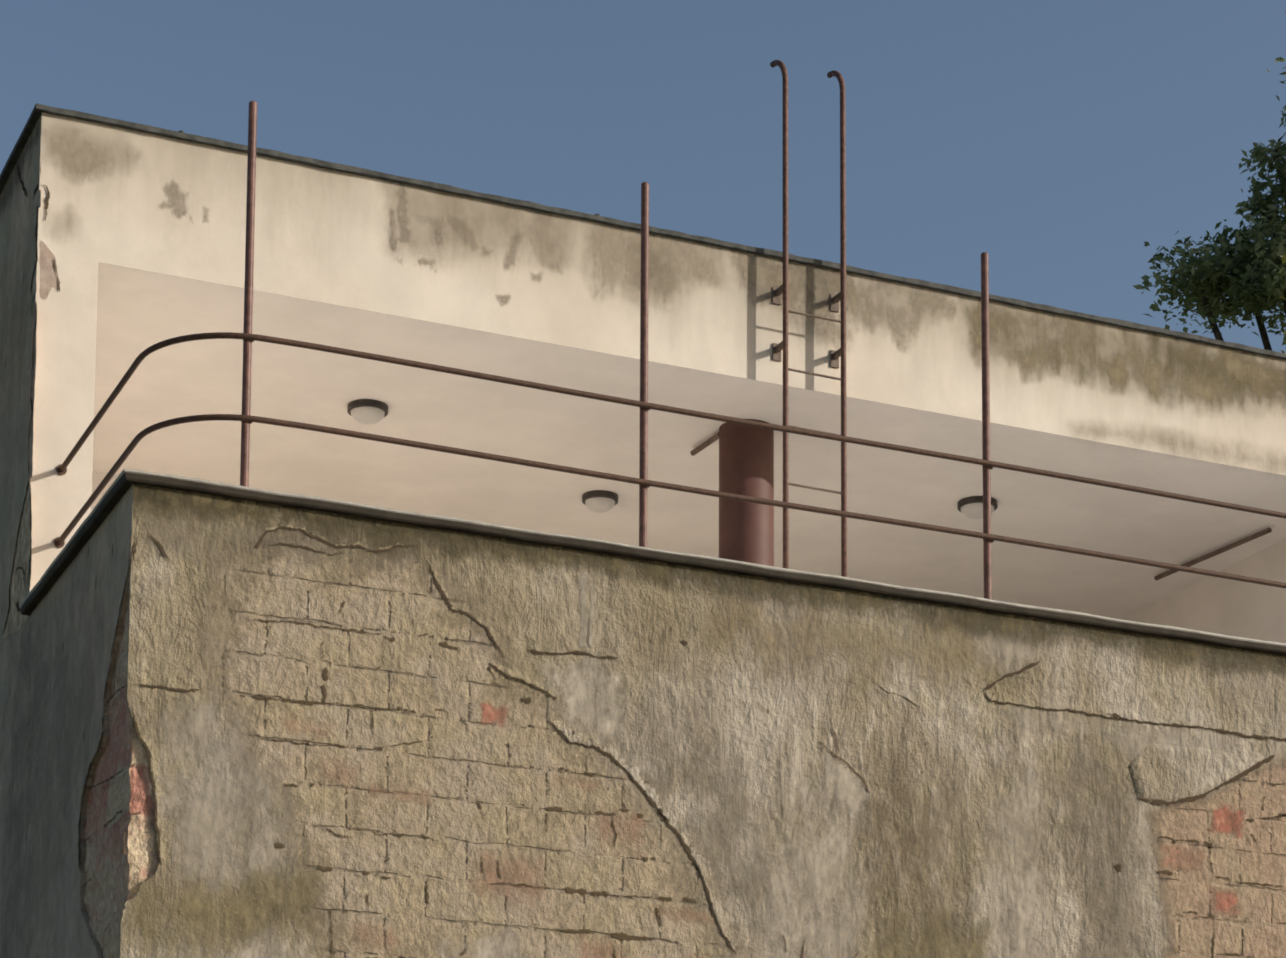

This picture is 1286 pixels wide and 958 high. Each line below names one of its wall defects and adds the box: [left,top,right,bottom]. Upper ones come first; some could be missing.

crack [17,166,50,473]
damp [0,122,111,205]
damp [390,189,409,251]
damp [592,226,716,291]
damp [738,251,1286,405]
spalling [77,601,170,958]
spalling [205,530,728,958]
crack [983,661,1286,741]
spalling [1151,762,1286,958]